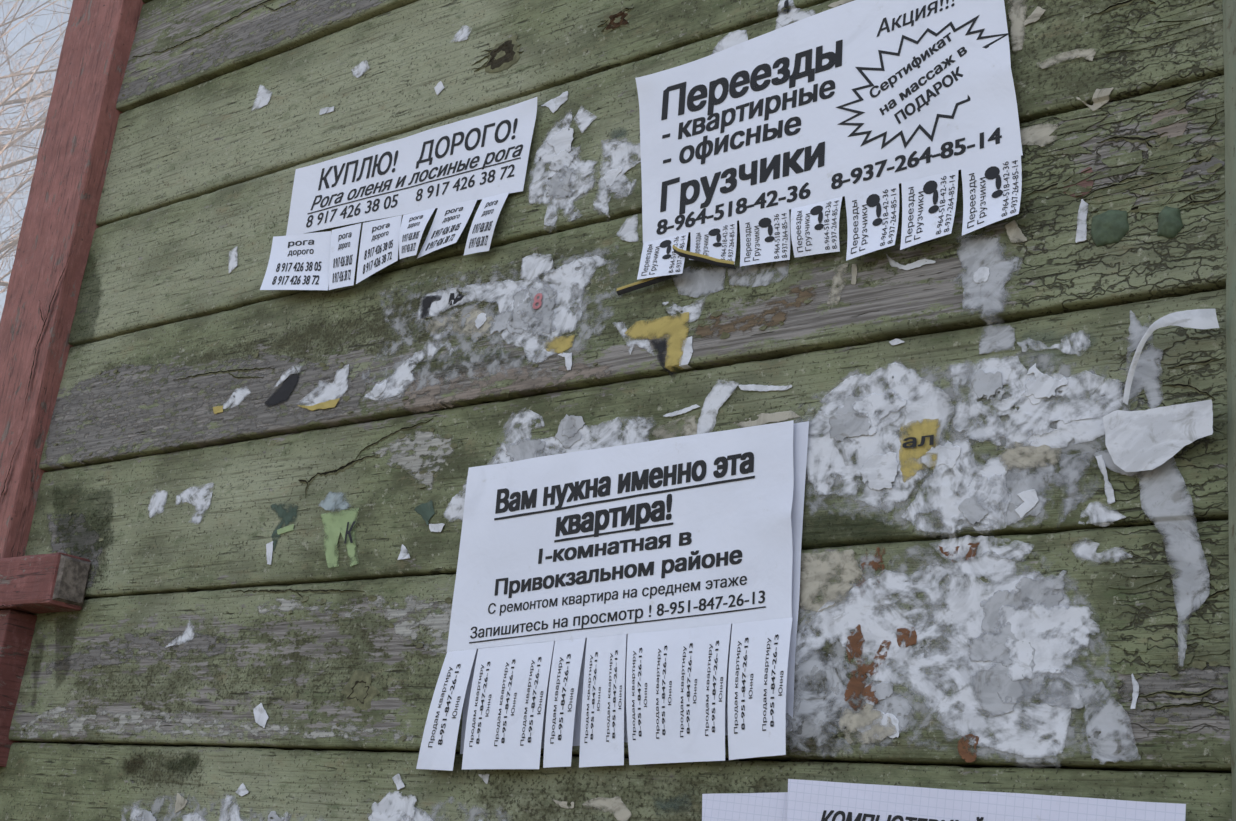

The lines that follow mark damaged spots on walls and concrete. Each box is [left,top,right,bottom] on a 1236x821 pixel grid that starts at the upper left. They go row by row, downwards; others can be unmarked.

crack [133,0,298,57]
peeling [117,0,391,103]
crack [1026,91,1226,215]
crack [298,418,433,498]